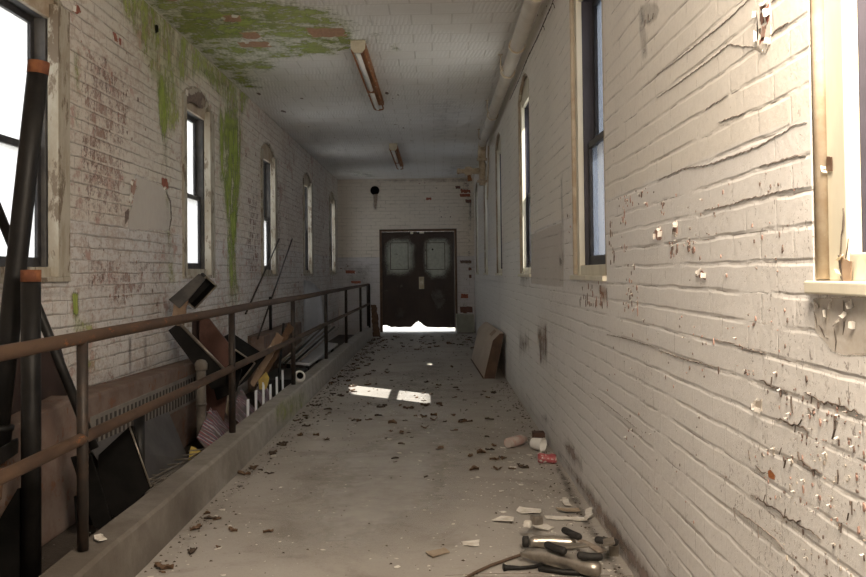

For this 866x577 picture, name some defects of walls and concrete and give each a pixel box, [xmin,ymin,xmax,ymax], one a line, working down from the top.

crack [657,0,753,98]
spalling [752,0,771,54]
crack [706,95,744,123]
crack [658,122,807,181]
peeling [813,299,855,329]
crack [611,335,717,368]
crack [719,341,765,353]
crack [748,377,859,484]
crack [733,495,853,549]